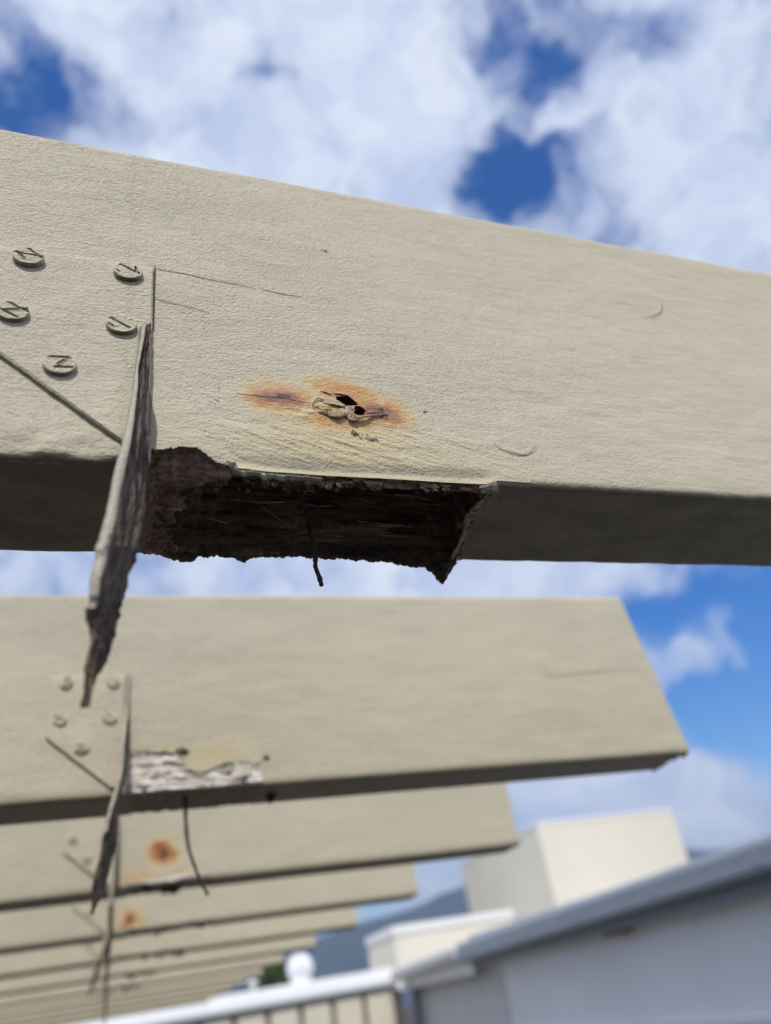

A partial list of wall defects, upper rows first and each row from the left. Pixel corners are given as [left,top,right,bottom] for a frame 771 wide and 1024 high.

corrosion [214,365,442,454]
peeling [226,460,322,483]
peeling [451,482,498,559]
peeling [126,747,270,792]
corrosion [115,832,195,886]